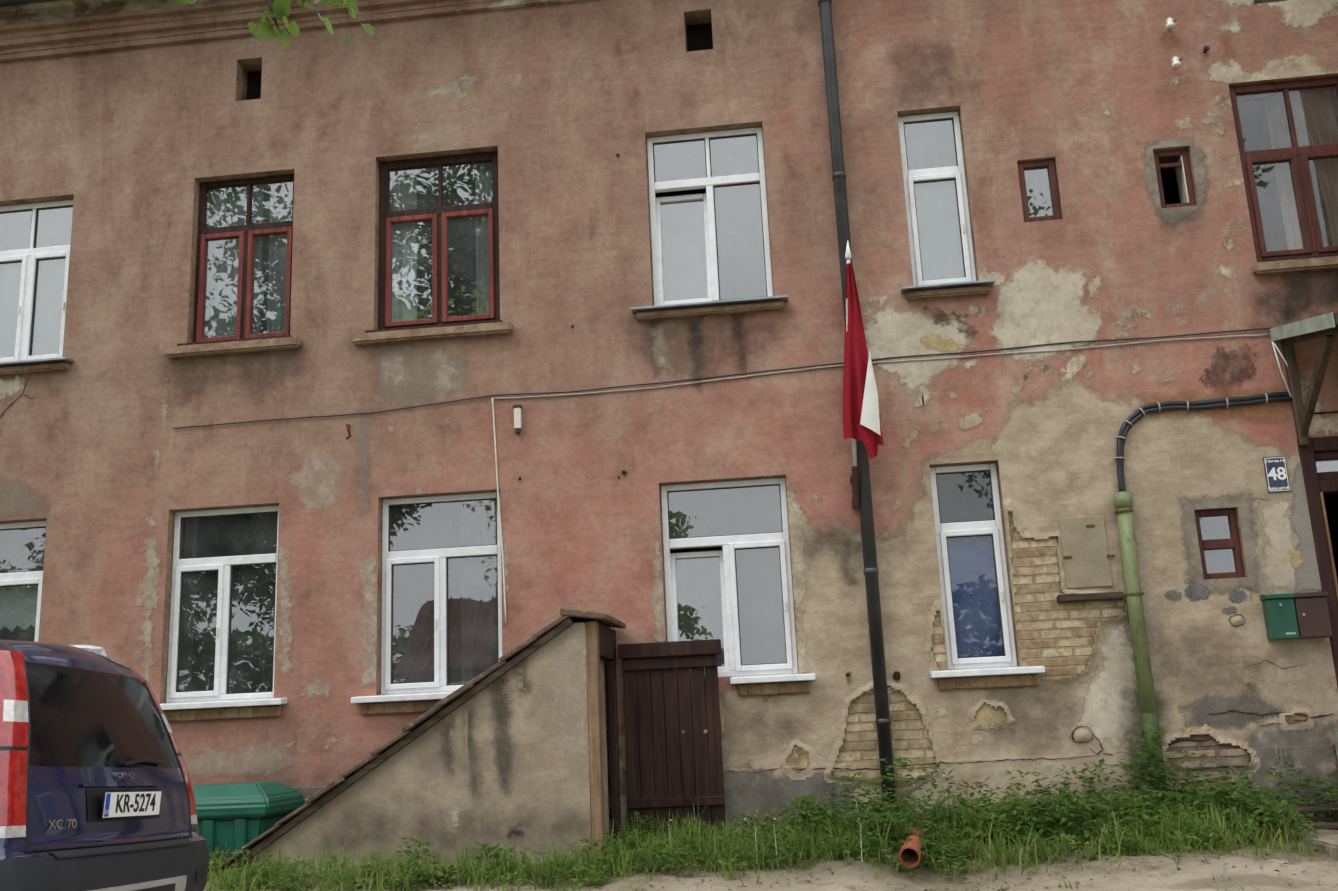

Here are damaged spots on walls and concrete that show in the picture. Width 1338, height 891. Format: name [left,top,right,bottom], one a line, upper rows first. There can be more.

flaking render [1221,0,1338,34]
flaking render [0,374,27,400]
crack [0,379,35,435]
leakage [1200,344,1258,389]
peeling [652,257,1338,834]
leakage [494,676,527,784]
crack [1168,710,1334,746]
peeling [609,728,630,834]